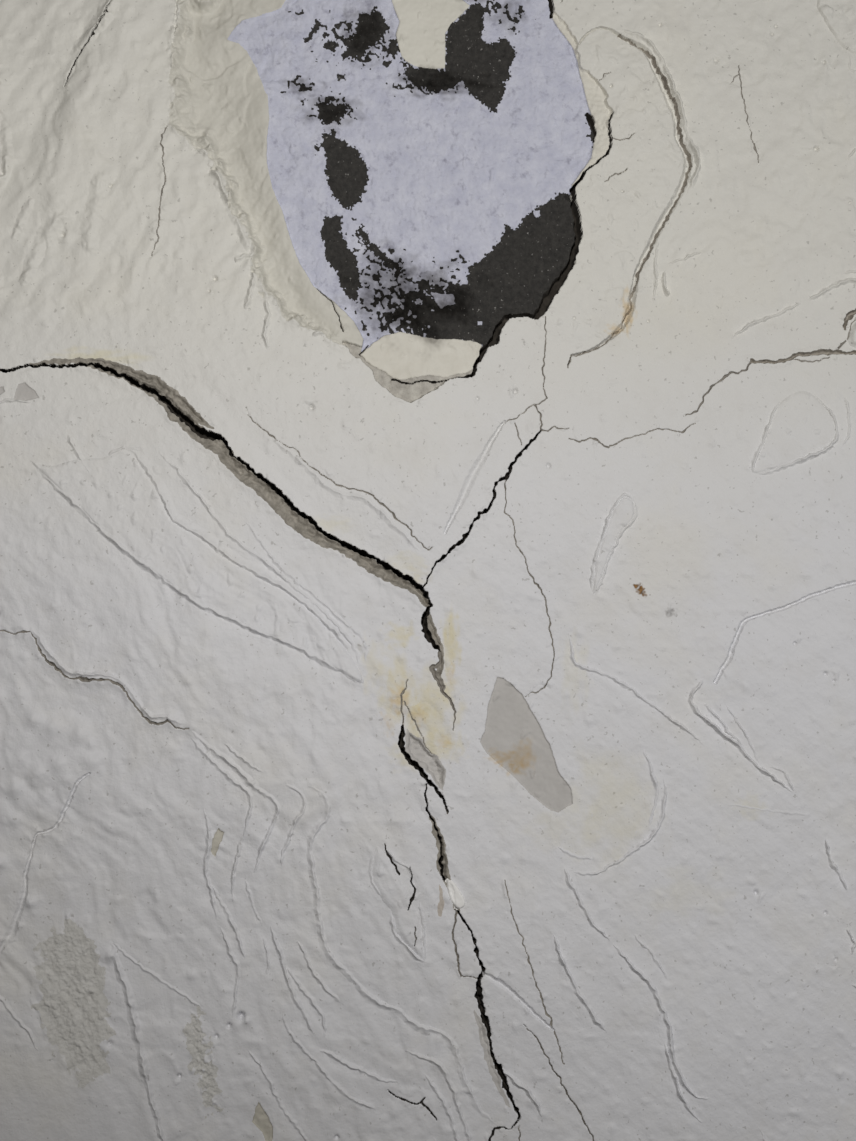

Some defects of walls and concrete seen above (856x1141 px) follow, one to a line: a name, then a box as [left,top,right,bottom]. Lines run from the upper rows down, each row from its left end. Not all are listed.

peeling [168,0,614,403]
crack [0,316,856,1141]
spalling [480,677,573,812]